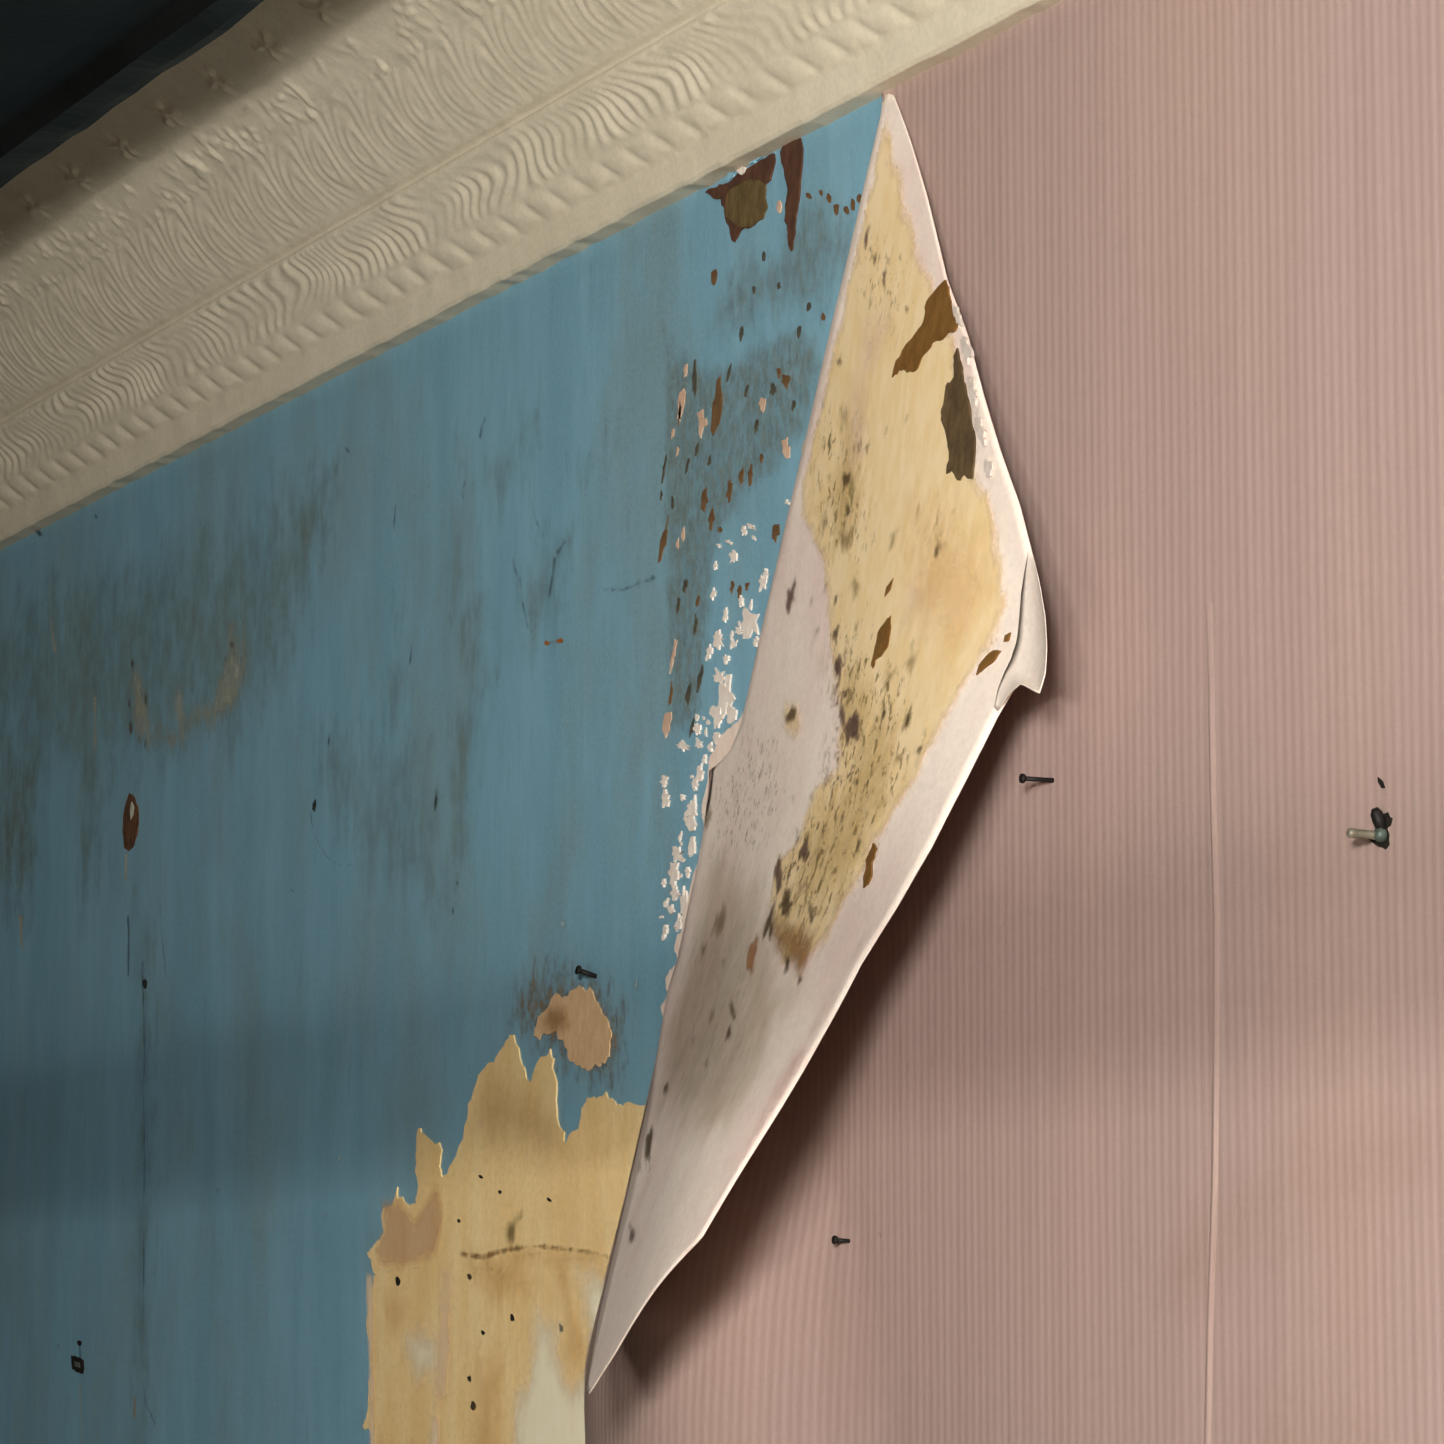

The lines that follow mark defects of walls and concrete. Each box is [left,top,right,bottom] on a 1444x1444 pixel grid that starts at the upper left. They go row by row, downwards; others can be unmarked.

peeling [705,138,804,251]
peeling [713,523,756,570]
leakage [658,129,1004,983]
peeling [659,568,770,941]
peeling [363,985,647,1444]